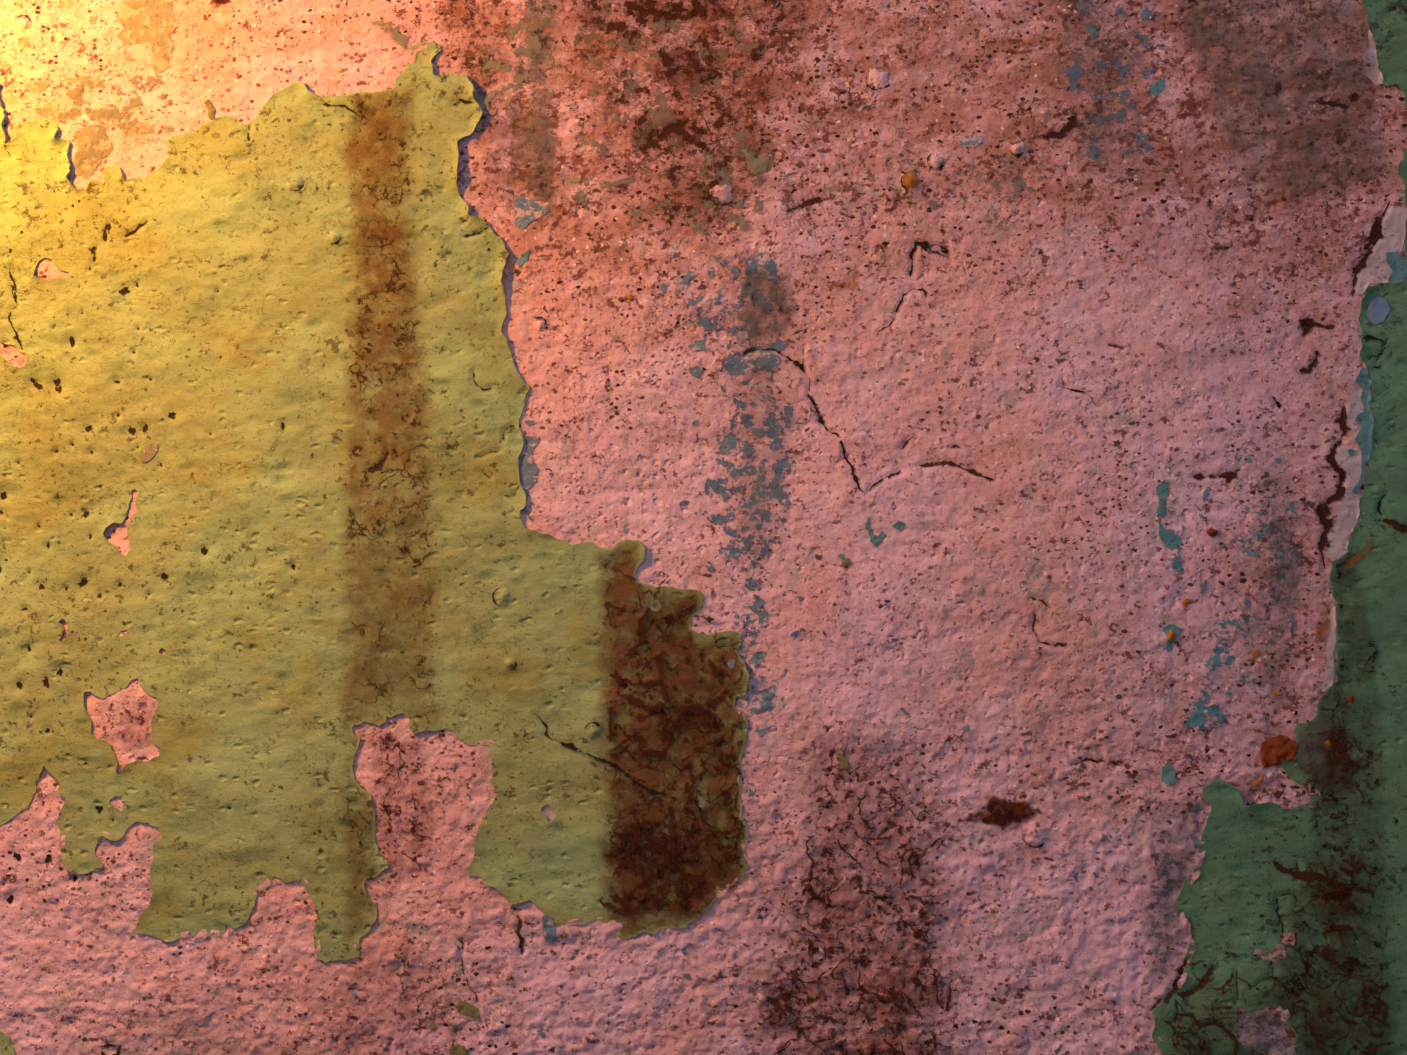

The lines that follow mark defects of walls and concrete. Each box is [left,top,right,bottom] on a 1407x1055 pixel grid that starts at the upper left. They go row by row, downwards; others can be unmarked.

water stain [575,0,807,231]
crack [878,241,949,332]
peeling [1356,206,1407,295]
water stain [347,90,433,725]
crack [741,347,994,494]
peeling [1326,367,1374,561]
peeling [1321,603,1337,692]
peeling [85,678,160,774]
crack [535,714,667,795]
rust [1252,735,1299,787]
water stain [347,732,431,889]
rust [962,796,1035,826]